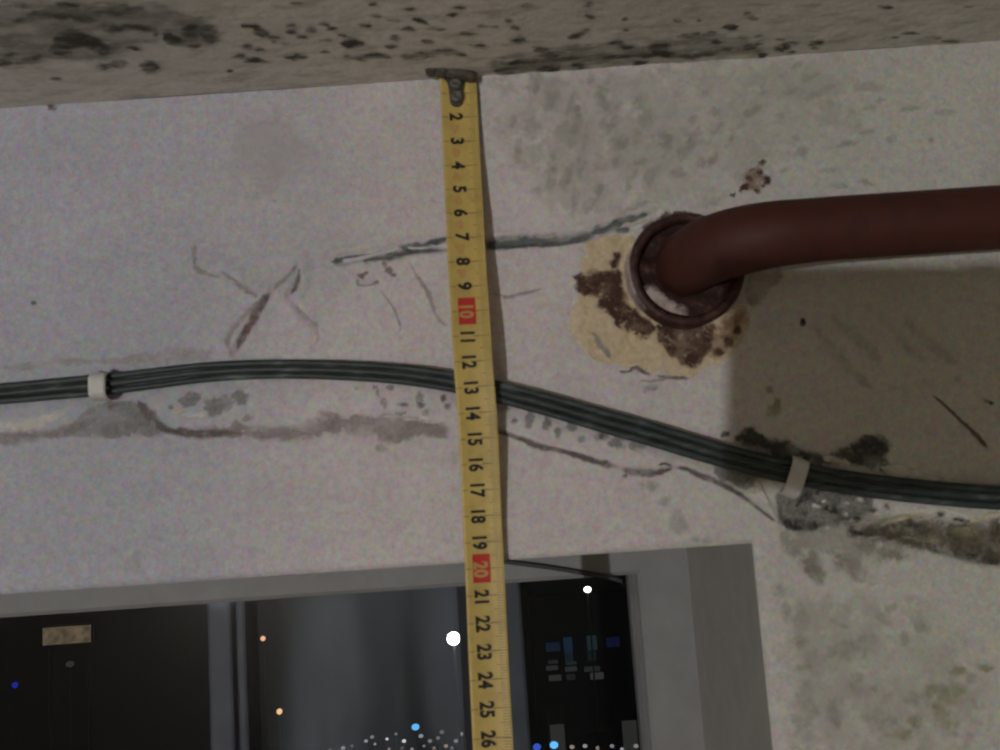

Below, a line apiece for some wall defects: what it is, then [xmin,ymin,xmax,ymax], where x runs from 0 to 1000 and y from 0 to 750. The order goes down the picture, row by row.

mould [0,2,217,70]
mould [138,62,160,74]
mould [232,8,428,63]
mould [491,2,796,74]
rust [730,159,771,197]
crack [237,270,300,348]
rust [574,252,748,368]
water stain [313,414,446,443]
crack [498,431,774,521]
flaking render [714,466,1000,565]